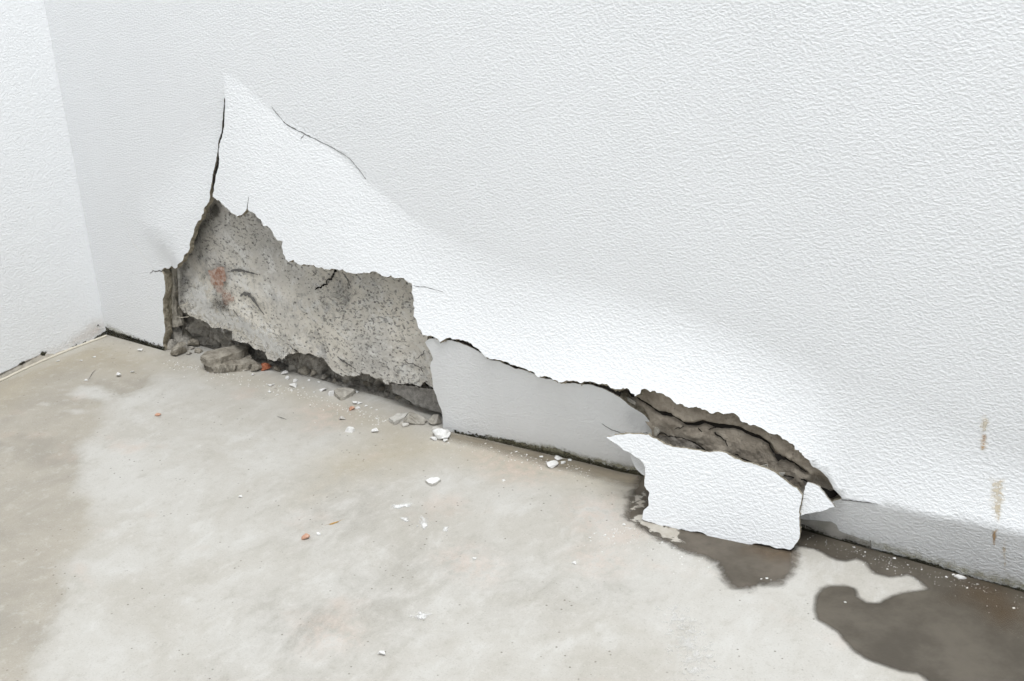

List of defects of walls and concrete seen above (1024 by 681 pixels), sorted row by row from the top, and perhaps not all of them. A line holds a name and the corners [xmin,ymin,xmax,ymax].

crack [212,98,225,190]
crack [273,109,366,179]
flaking render [162,198,442,414]
flaking render [624,389,872,549]
damp [450,430,1024,681]